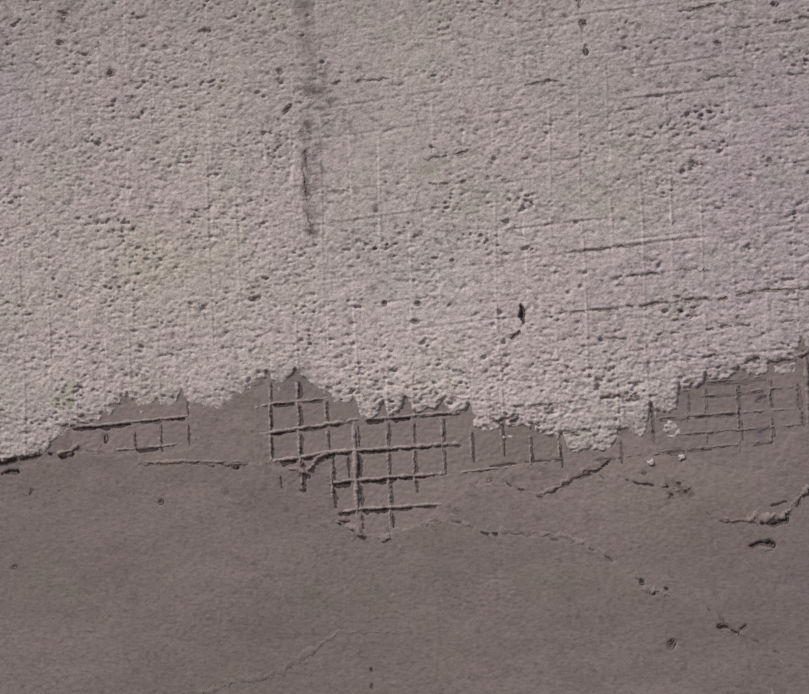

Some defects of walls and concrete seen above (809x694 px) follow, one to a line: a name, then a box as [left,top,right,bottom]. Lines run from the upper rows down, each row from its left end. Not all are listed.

spalling [60,389,202,461]
spalling [250,369,564,542]
crack [506,459,610,498]
spalling [596,349,809,476]
crack [398,508,623,562]
crack [707,484,809,552]
crack [707,606,780,654]